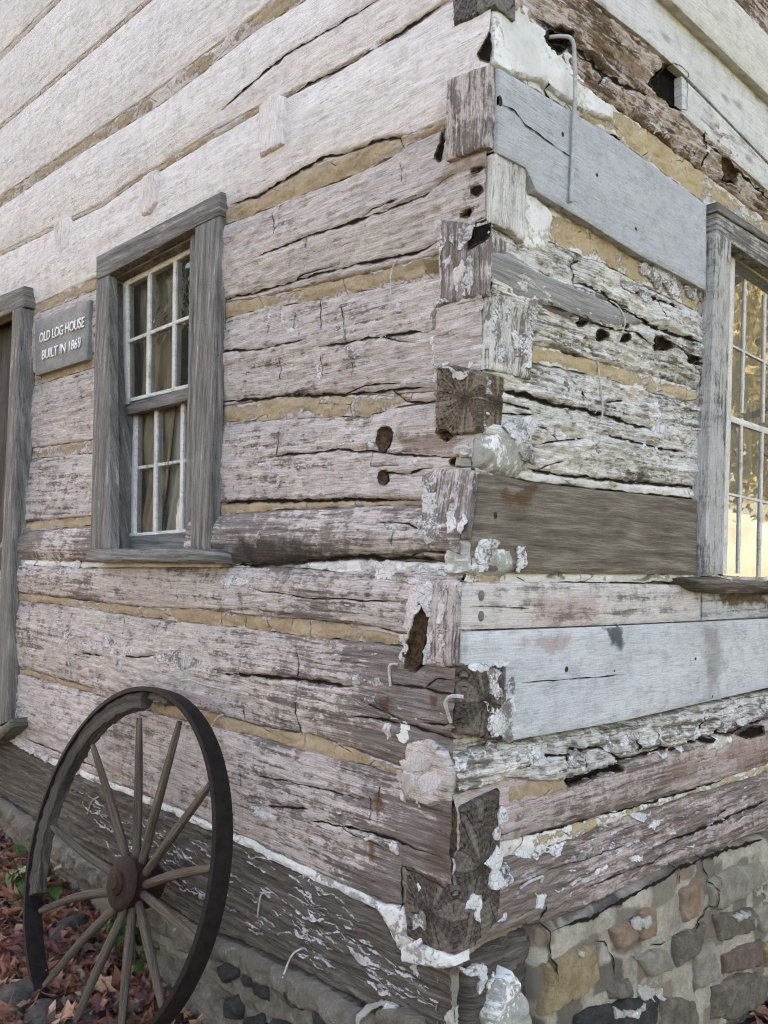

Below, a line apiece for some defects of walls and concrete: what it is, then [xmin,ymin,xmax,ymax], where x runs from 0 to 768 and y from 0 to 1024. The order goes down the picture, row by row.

crack [222,0,378,110]
crack [286,2,447,97]
crack [259,174,453,256]
crack [223,383,430,404]
peeling [333,559,448,676]
peeling [453,659,516,771]
crack [515,718,765,770]
peeling [74,791,211,900]
peeling [361,833,399,855]
peeling [465,802,695,923]
crack [538,799,768,987]
peeling [225,873,459,1024]